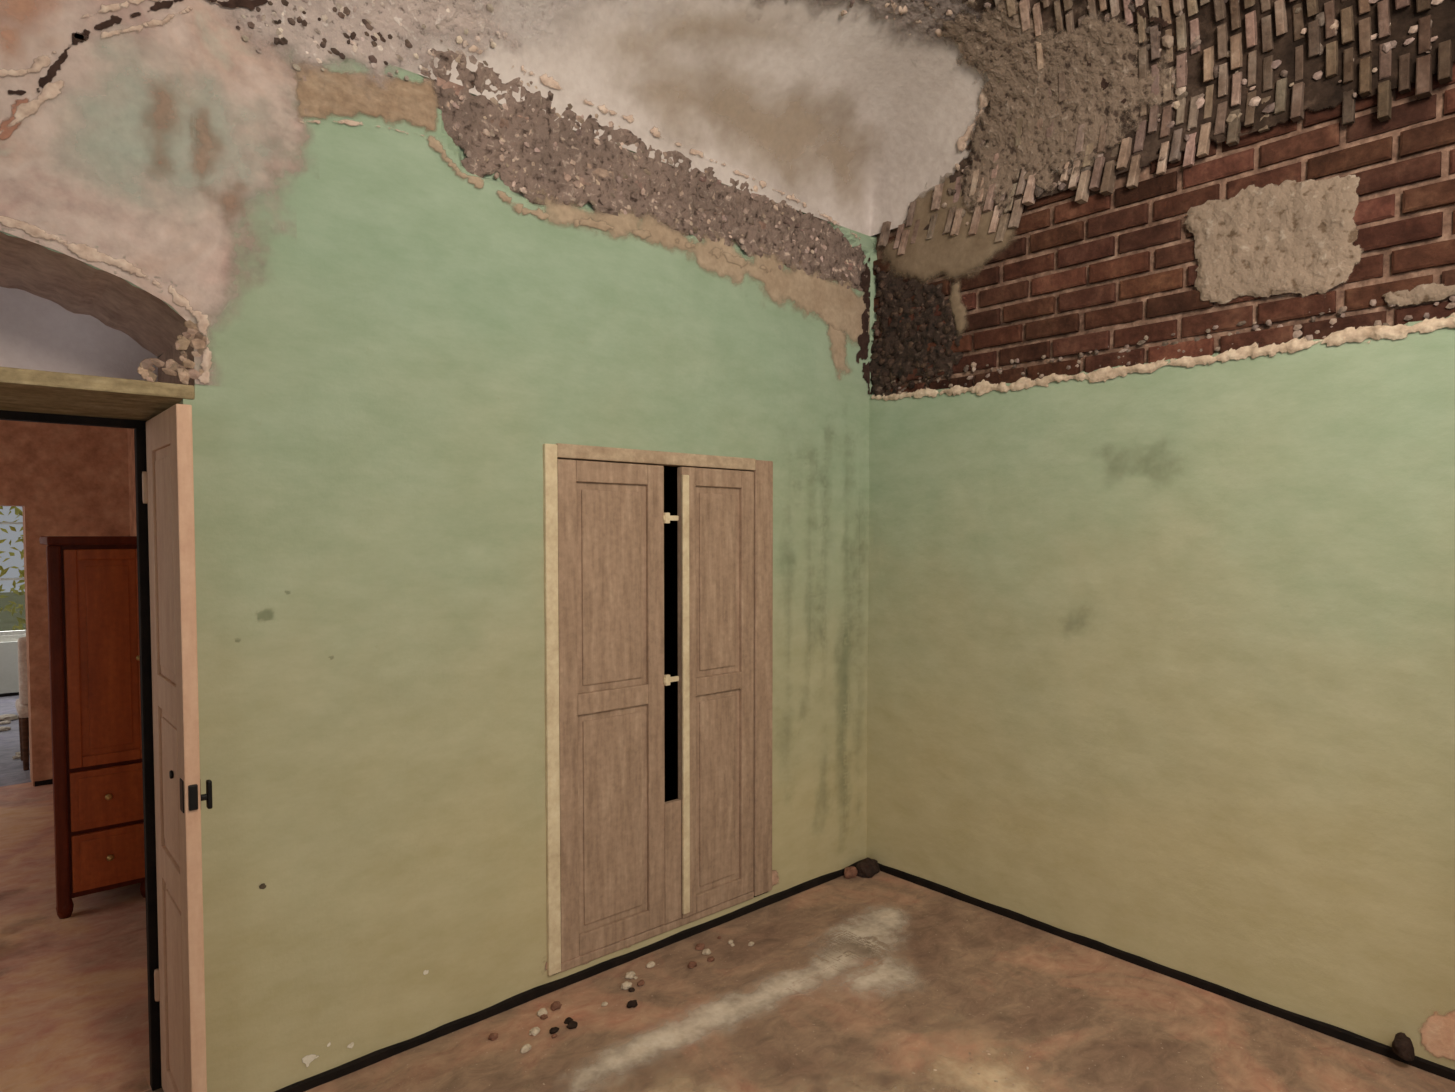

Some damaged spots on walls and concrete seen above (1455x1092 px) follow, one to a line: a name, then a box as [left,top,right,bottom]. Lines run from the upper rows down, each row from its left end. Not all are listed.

crack [0,0,268,140]
flaking render [0,0,1455,401]
peeling [1420,1010,1455,1061]